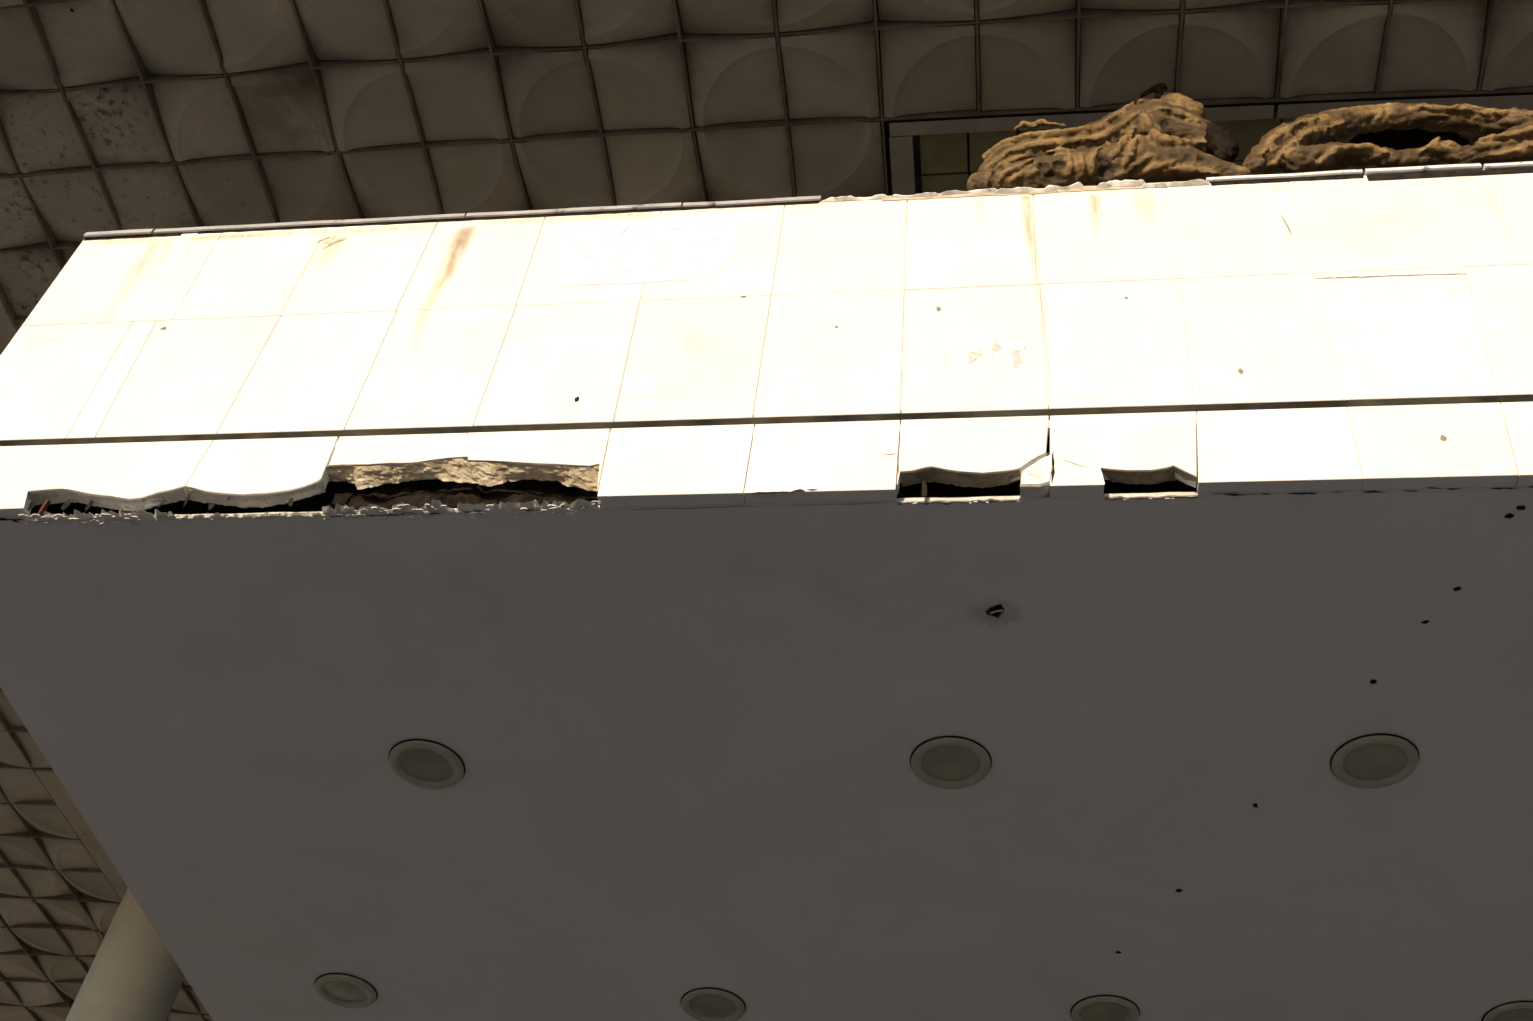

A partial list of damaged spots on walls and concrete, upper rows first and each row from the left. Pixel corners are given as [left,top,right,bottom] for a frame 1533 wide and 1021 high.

spalling [19,458,601,526]
spalling [896,468,1021,505]
spalling [1101,467,1199,500]